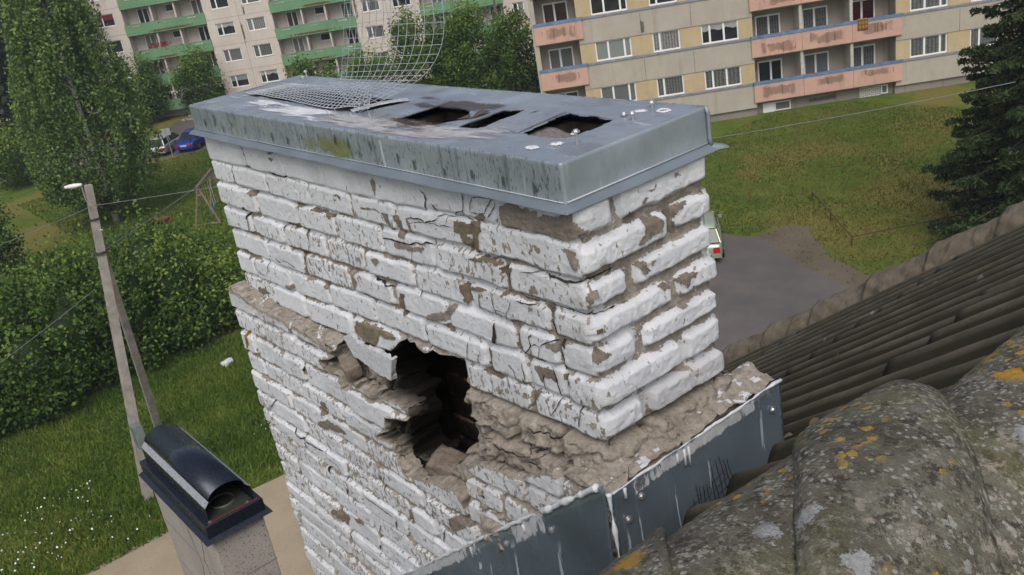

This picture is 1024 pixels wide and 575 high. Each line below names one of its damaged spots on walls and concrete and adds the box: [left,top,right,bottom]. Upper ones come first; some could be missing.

crack [376,189,495,300]
spalling [453,214,518,297]
flaking render [499,203,589,271]
peeling [623,185,692,246]
peeling [657,271,698,291]
flaking render [354,321,396,346]
peeling [482,348,506,394]
crack [467,267,615,470]
peeling [528,365,570,409]
peeling [592,346,612,365]
peeling [317,401,347,435]
peeling [331,509,364,525]